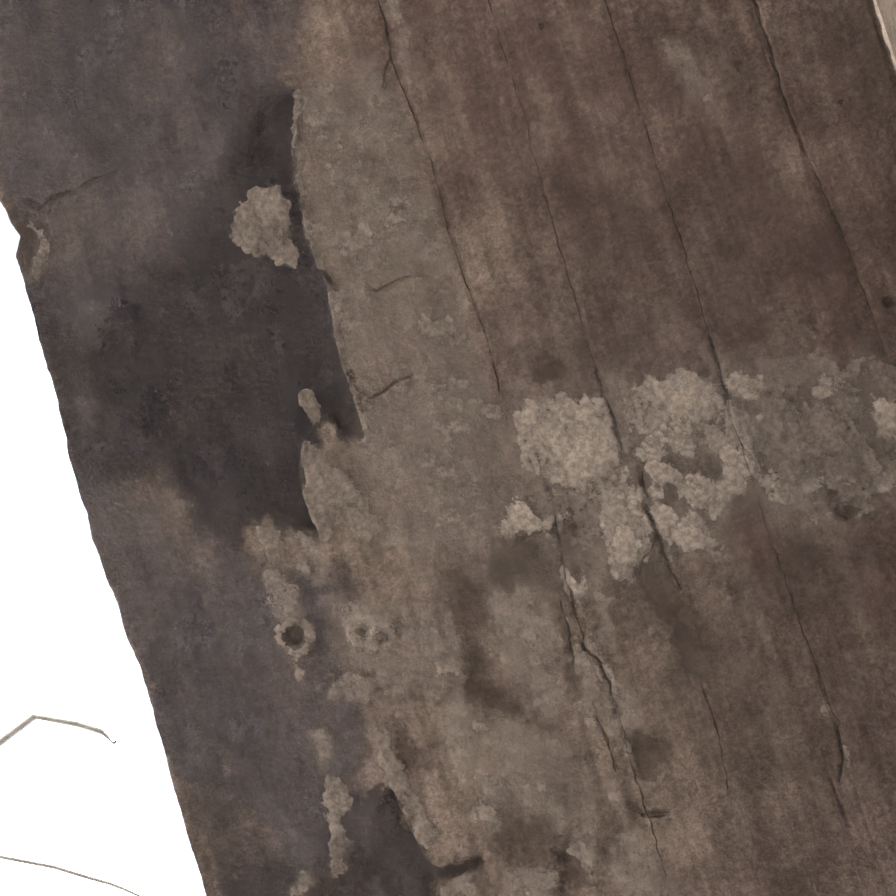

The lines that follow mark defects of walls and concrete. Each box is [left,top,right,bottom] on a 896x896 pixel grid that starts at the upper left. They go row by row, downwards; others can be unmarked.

peeling [229,87,325,279]
crack [379,4,435,177]
crack [488,0,581,320]
damp [0,0,479,896]
peeling [298,389,388,543]
spalling [328,290,360,408]
crack [360,375,413,399]
damp [391,350,896,583]
crack [604,0,844,790]
spalling [369,722,442,849]
spalling [413,858,483,896]
crack [554,514,666,877]